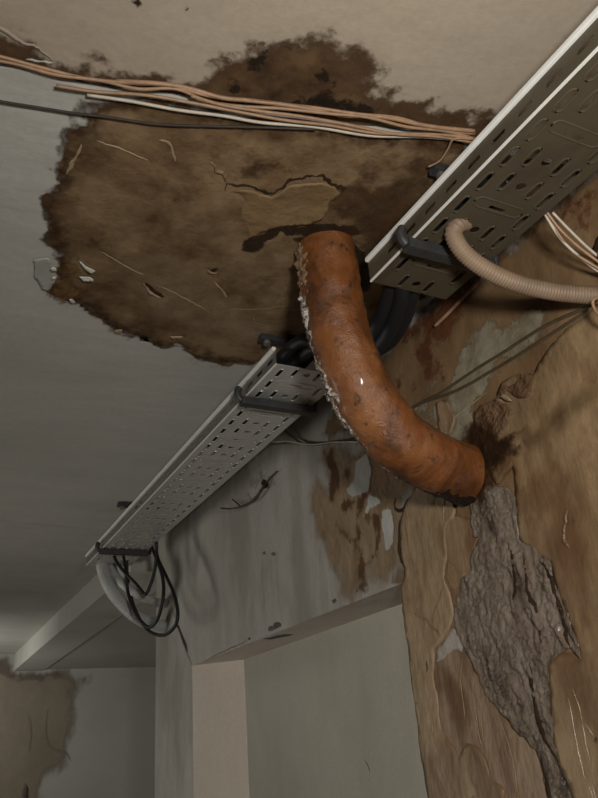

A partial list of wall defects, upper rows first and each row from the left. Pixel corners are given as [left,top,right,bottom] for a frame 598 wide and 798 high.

peeling [34,258,56,291]
peeling [79,262,95,282]
water stain [0,34,495,493]
crack [210,162,345,195]
peeling [225,182,340,238]
water stain [499,174,598,286]
water stain [382,274,598,443]
peeling [347,305,598,798]